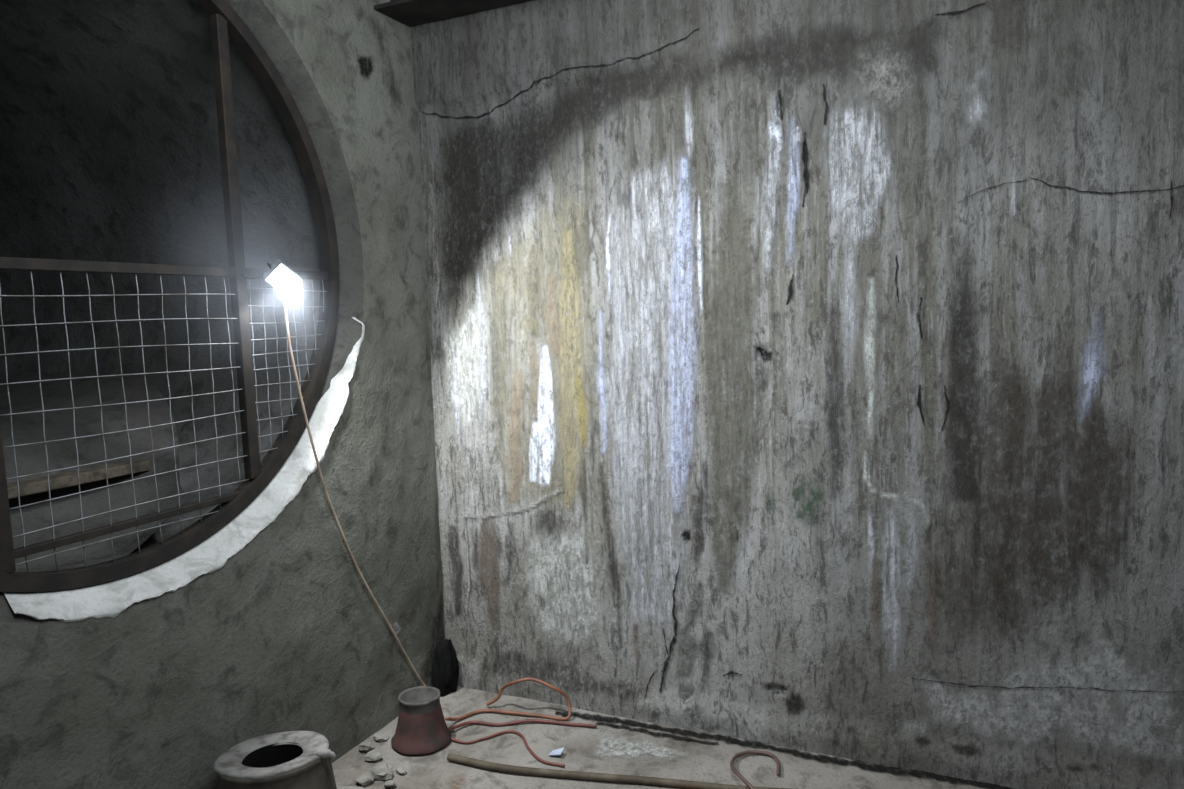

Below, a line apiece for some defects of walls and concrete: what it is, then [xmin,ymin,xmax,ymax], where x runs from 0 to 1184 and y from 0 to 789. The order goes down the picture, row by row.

leakage [727,30,936,81]
leakage [445,62,692,509]
leakage [598,105,754,623]
leakage [765,118,799,268]
leakage [827,258,854,480]
leakage [947,275,1119,629]
leakage [531,537,598,640]
crack [555,565,1013,789]